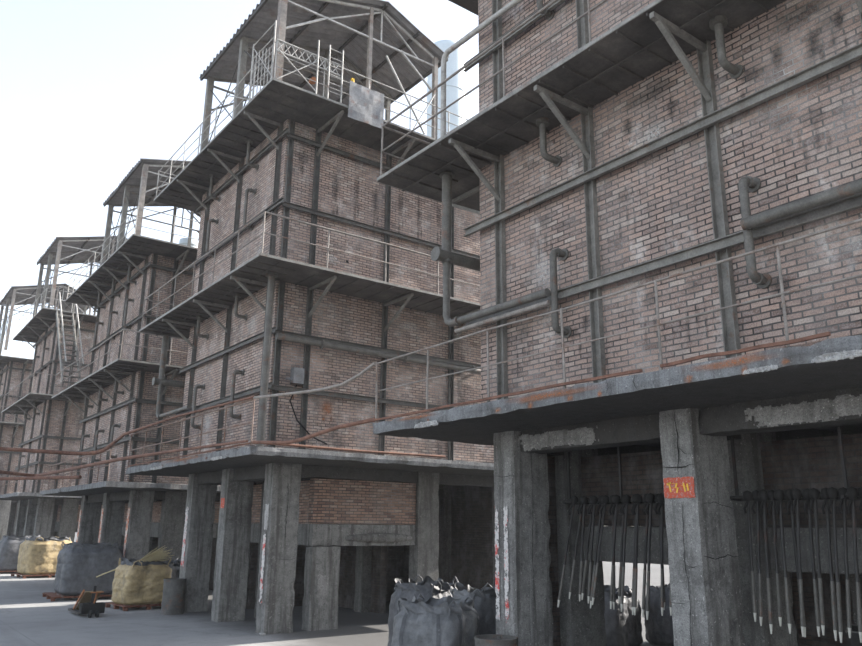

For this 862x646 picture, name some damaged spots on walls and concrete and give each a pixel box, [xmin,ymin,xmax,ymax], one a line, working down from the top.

spalling [744,394,862,429]
spalling [519,426,599,451]